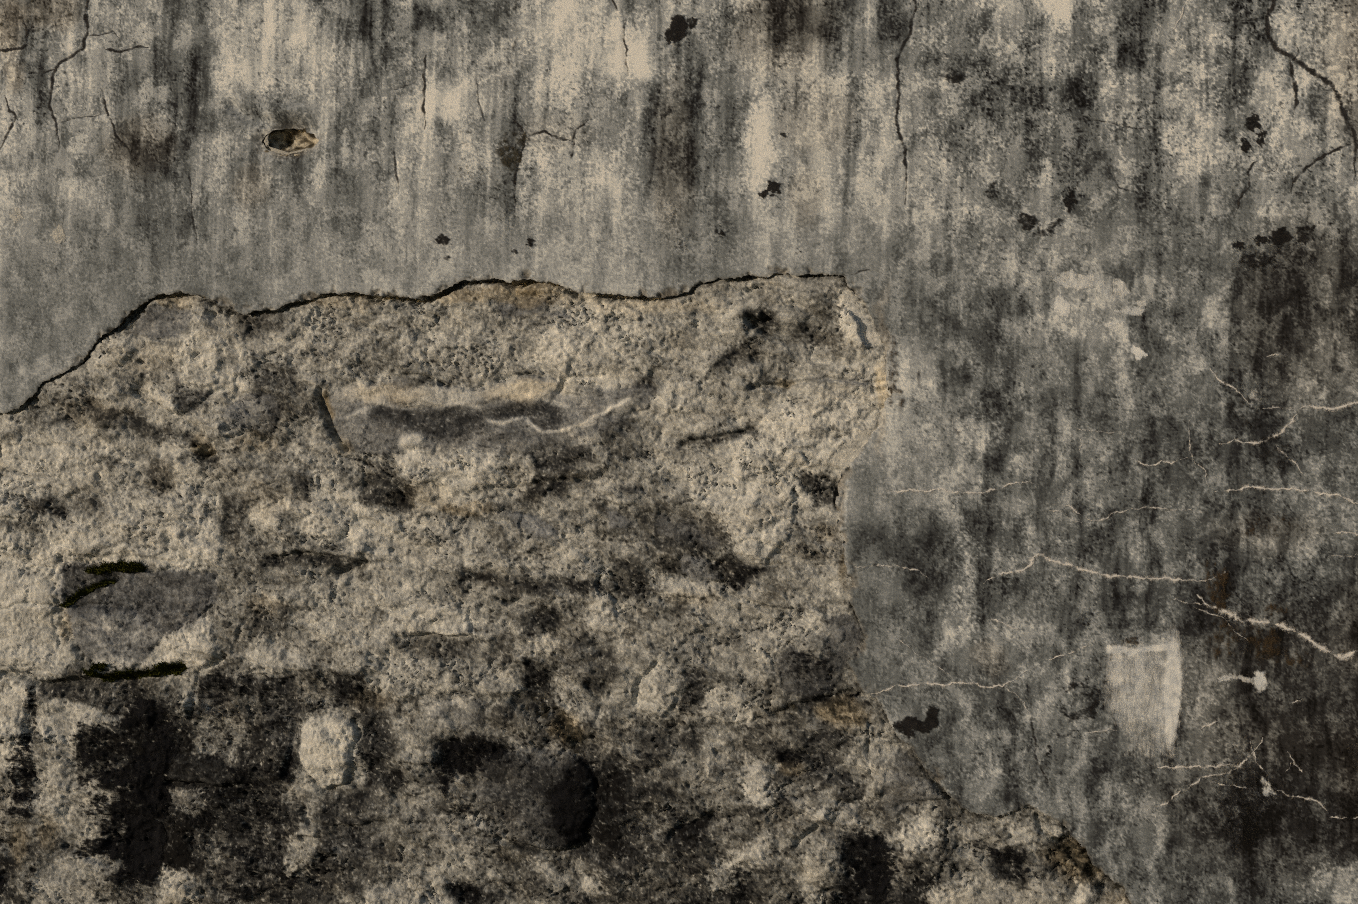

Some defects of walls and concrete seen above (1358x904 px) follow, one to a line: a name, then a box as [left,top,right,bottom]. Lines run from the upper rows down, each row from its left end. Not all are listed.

crack [0,0,148,161]
spalling [264,129,319,158]
leakage [660,2,697,146]
crack [895,0,917,205]
mould [1240,111,1267,157]
crack [1224,0,1358,216]
leakage [1231,225,1358,341]
crack [1054,369,1358,557]
spalling [0,273,1131,904]
crack [983,553,1355,660]
leakage [1218,671,1267,700]
leakage [69,670,369,904]